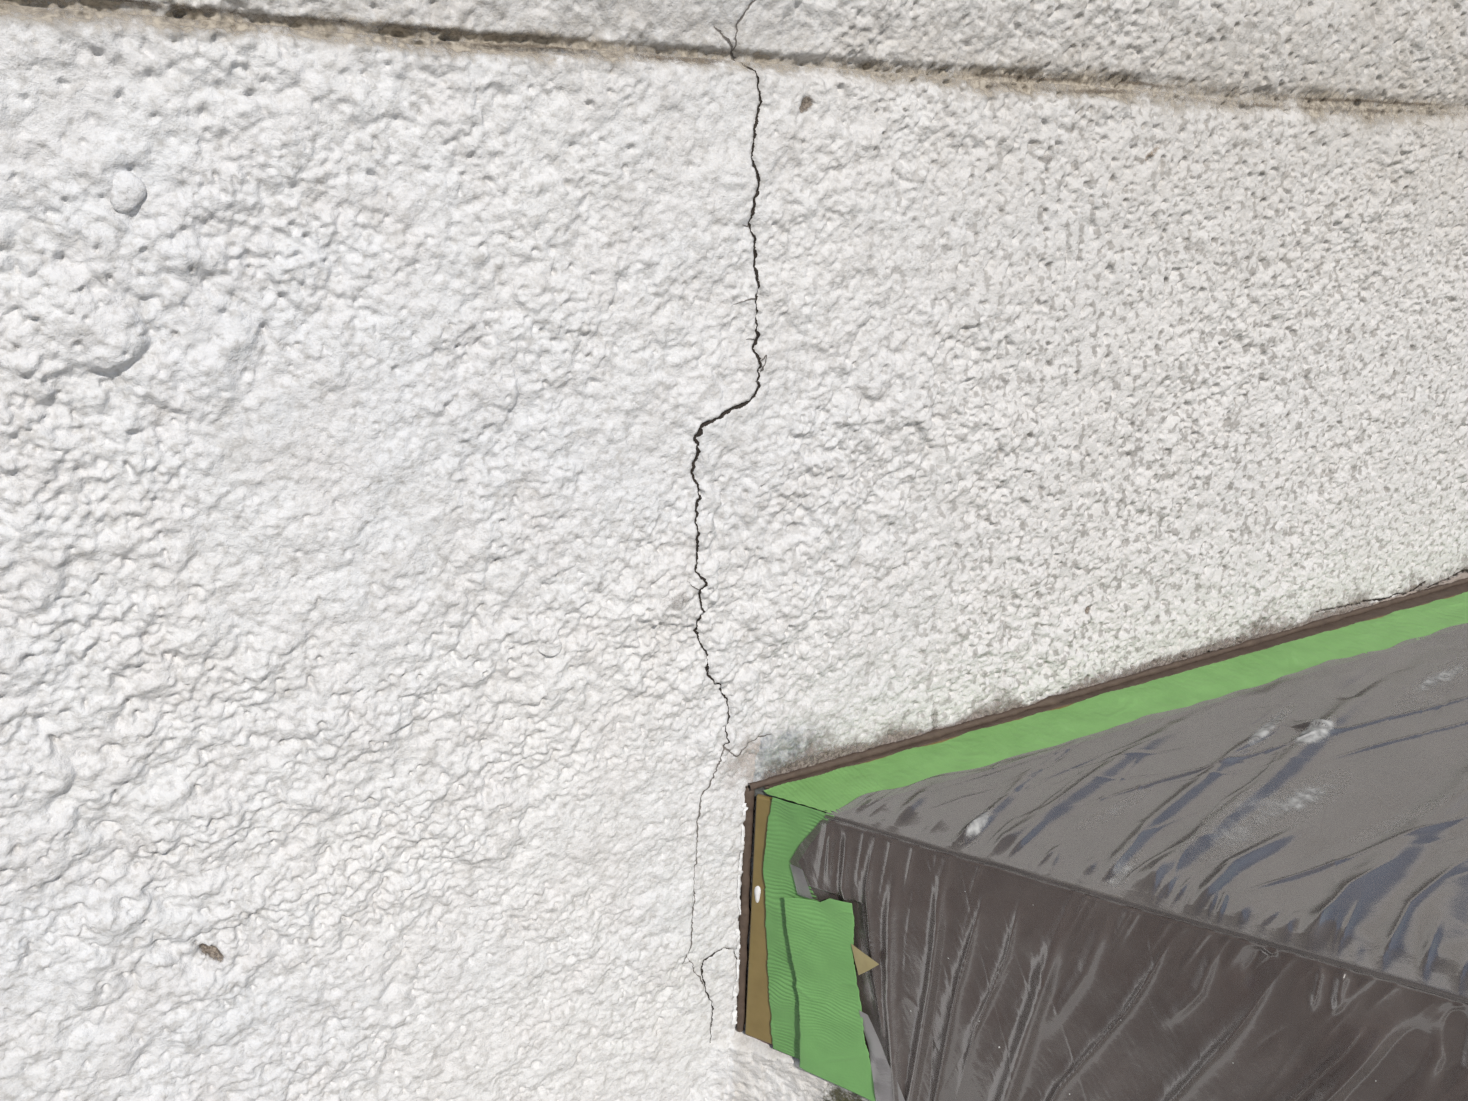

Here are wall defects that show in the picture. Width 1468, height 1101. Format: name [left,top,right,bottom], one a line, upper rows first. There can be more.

crack [683,0,771,1043]